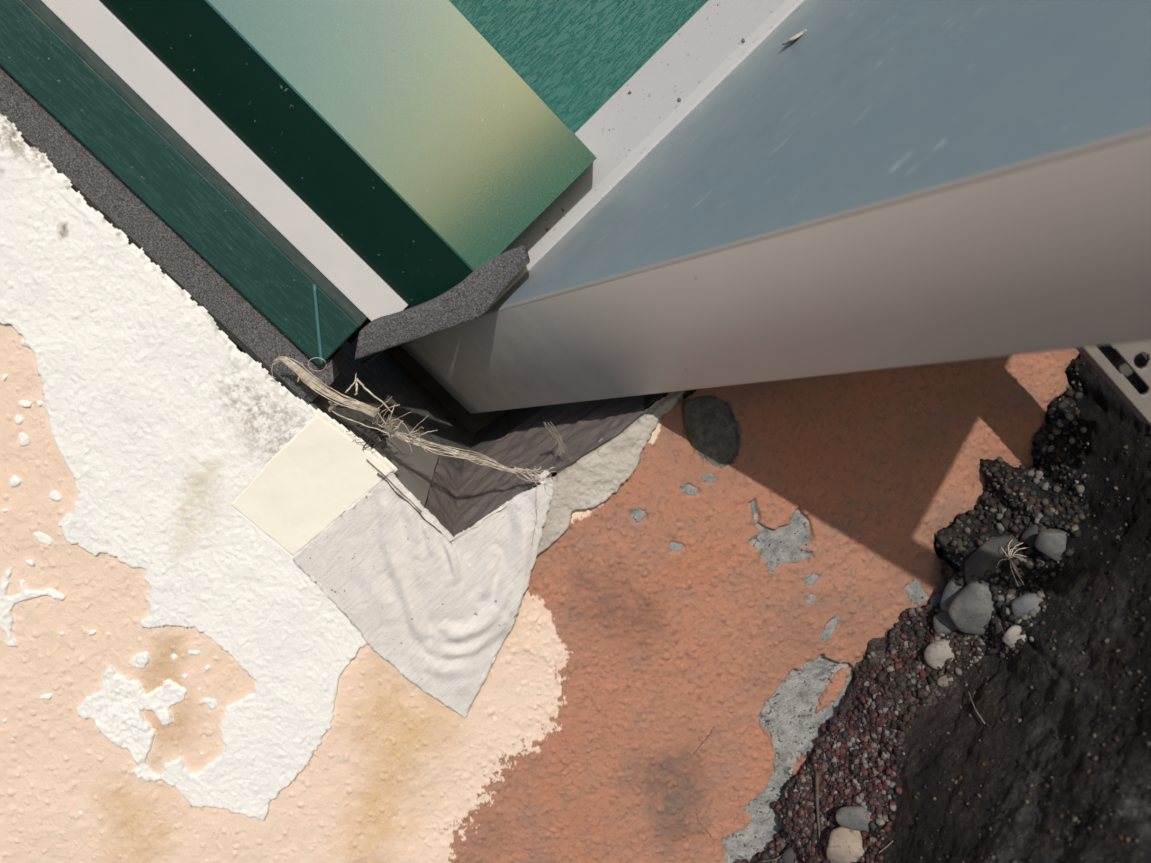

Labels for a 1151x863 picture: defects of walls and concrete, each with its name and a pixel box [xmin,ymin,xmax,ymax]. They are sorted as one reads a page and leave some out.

flaking render [0,113,368,821]
flaking render [536,391,741,557]
spalling [748,500,814,576]
spalling [803,573,819,605]
spalling [905,578,930,606]
spalling [721,615,855,863]